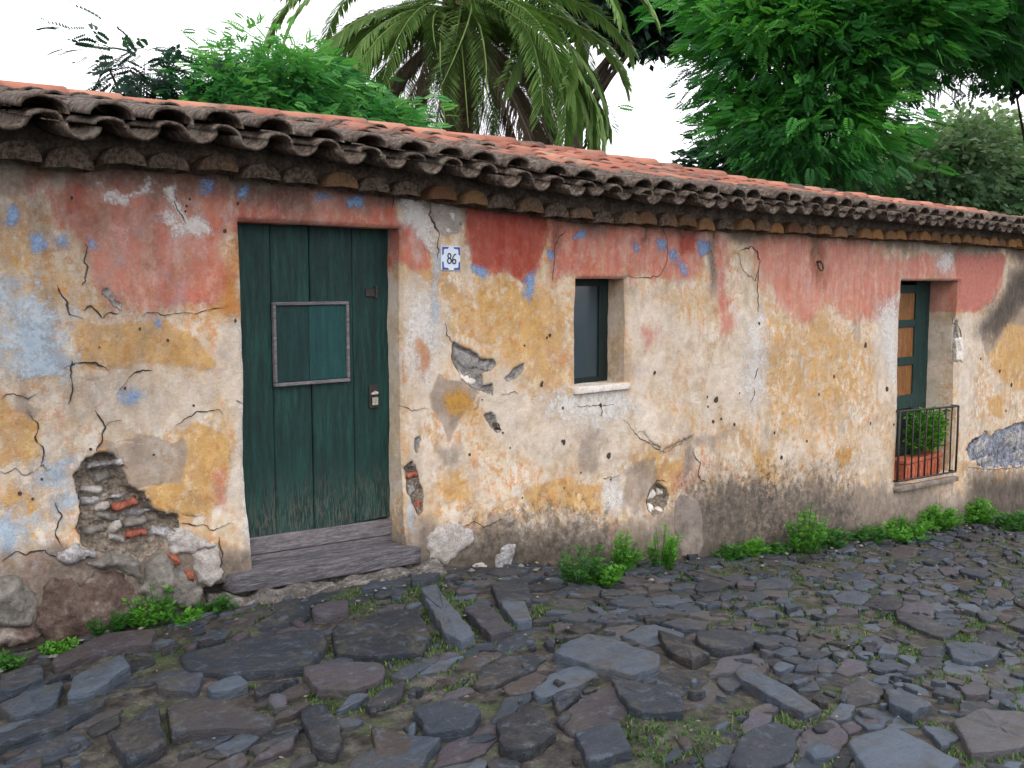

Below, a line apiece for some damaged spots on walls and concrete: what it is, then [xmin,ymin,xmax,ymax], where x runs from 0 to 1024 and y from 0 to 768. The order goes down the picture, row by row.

crack [57,243,118,318]
flaking render [400,199,504,434]
water stain [988,273,1024,326]
crack [64,360,151,404]
crack [1,393,47,475]
crack [4,502,63,560]
crack [95,410,121,452]
flaking render [74,319,250,563]
flaking render [404,436,424,527]
flaking render [646,482,669,515]
water stain [685,466,855,557]
flaking render [966,422,1024,471]